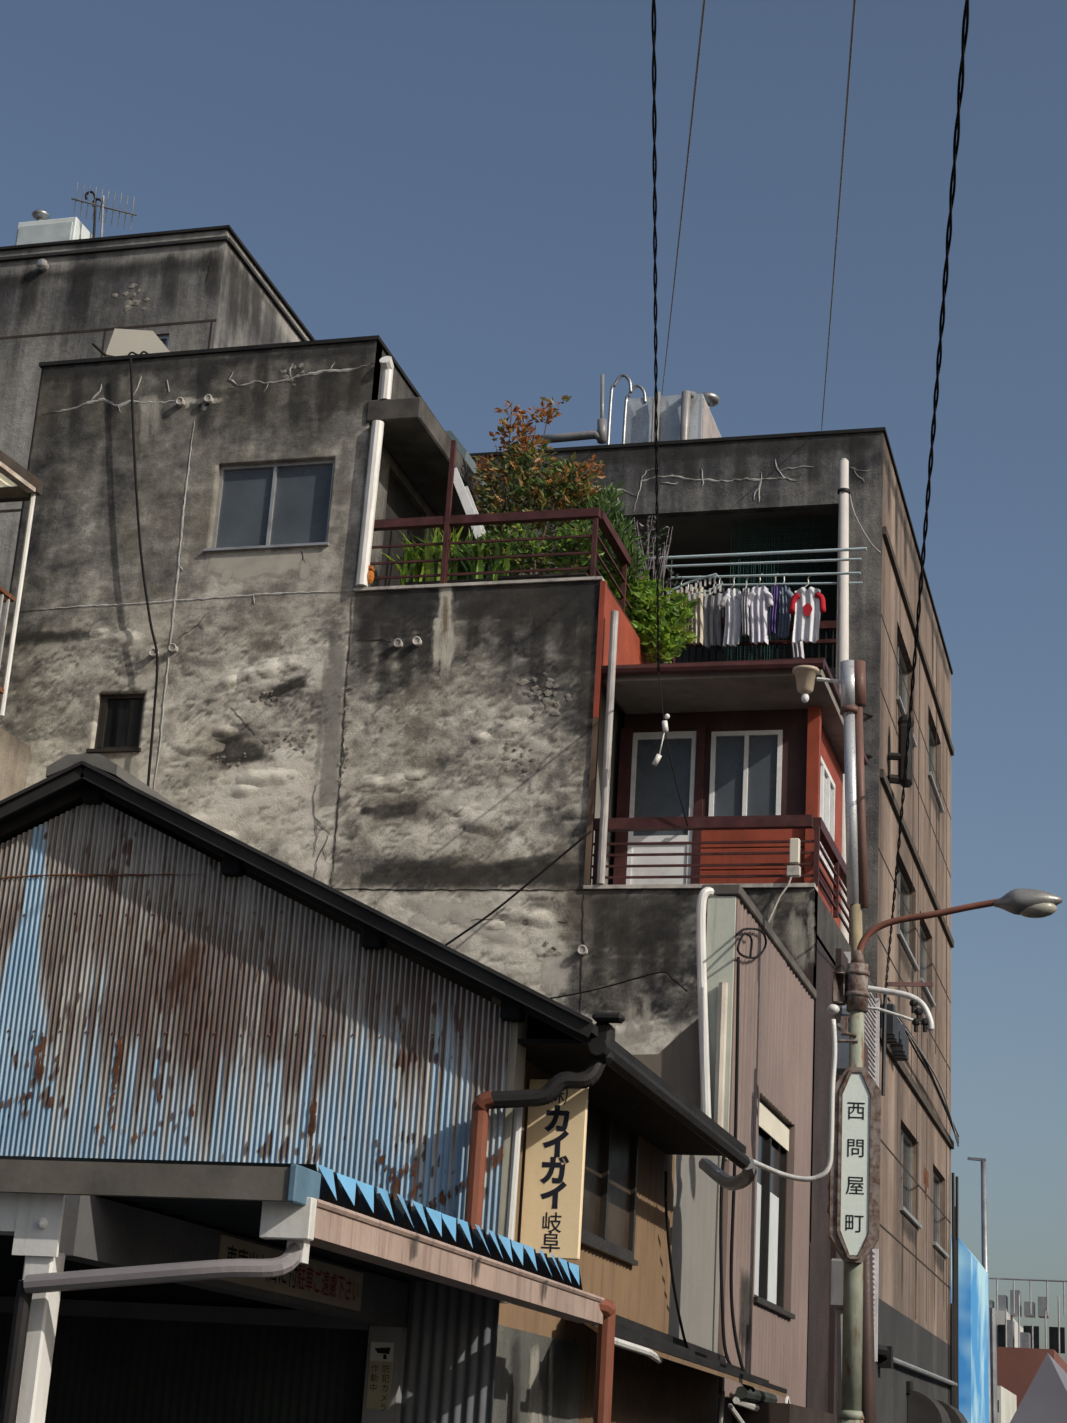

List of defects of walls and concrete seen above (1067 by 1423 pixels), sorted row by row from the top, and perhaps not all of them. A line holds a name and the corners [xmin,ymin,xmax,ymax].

leakage [4,252,270,325]
crack [226,362,375,391]
crack [600,460,873,510]
leakage [360,587,595,715]
crack [19,378,585,1013]
leakage [361,802,417,819]
corrosion [1,1030,68,1108]
corrosion [95,1036,148,1146]
corrosion [308,1099,317,1164]
corrosion [485,1146,503,1173]
leakage [512,1344,552,1423]